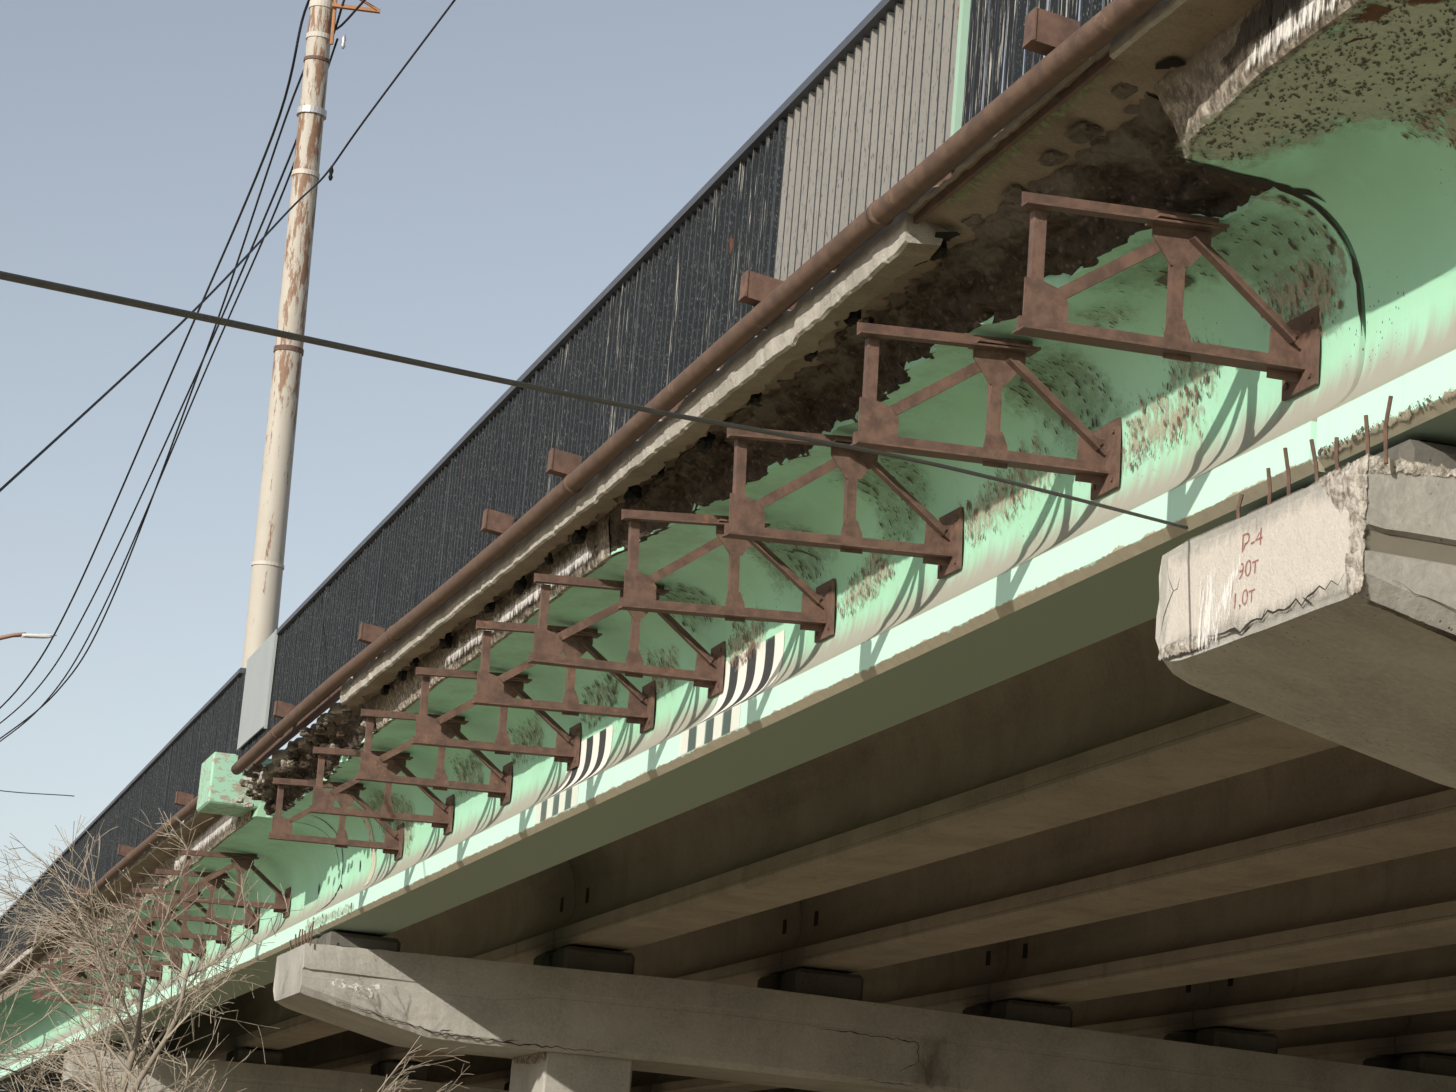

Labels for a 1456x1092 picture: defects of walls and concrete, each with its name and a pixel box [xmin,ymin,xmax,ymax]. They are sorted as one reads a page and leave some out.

peeling [239,0,1456,815]
spalling [79,797,254,943]
peeling [349,791,415,887]
spalling [290,903,354,950]
crack [330,997,610,1053]
crack [814,1026,931,1086]